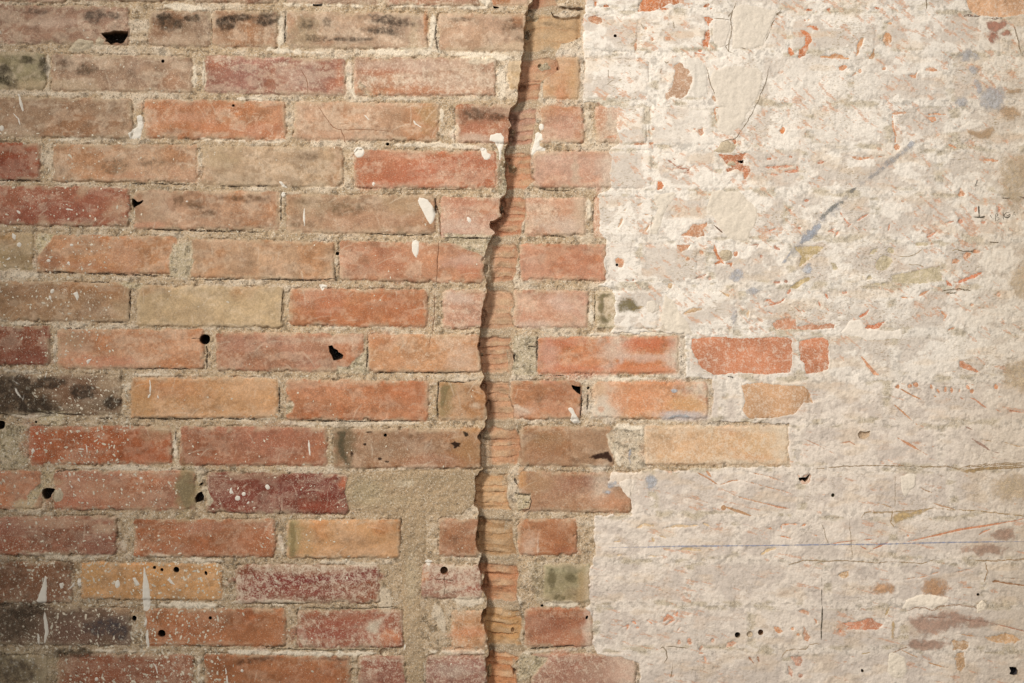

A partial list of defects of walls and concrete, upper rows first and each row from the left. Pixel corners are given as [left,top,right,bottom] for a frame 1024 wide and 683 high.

crack [301,0,584,683]
peeling [582,0,1024,683]